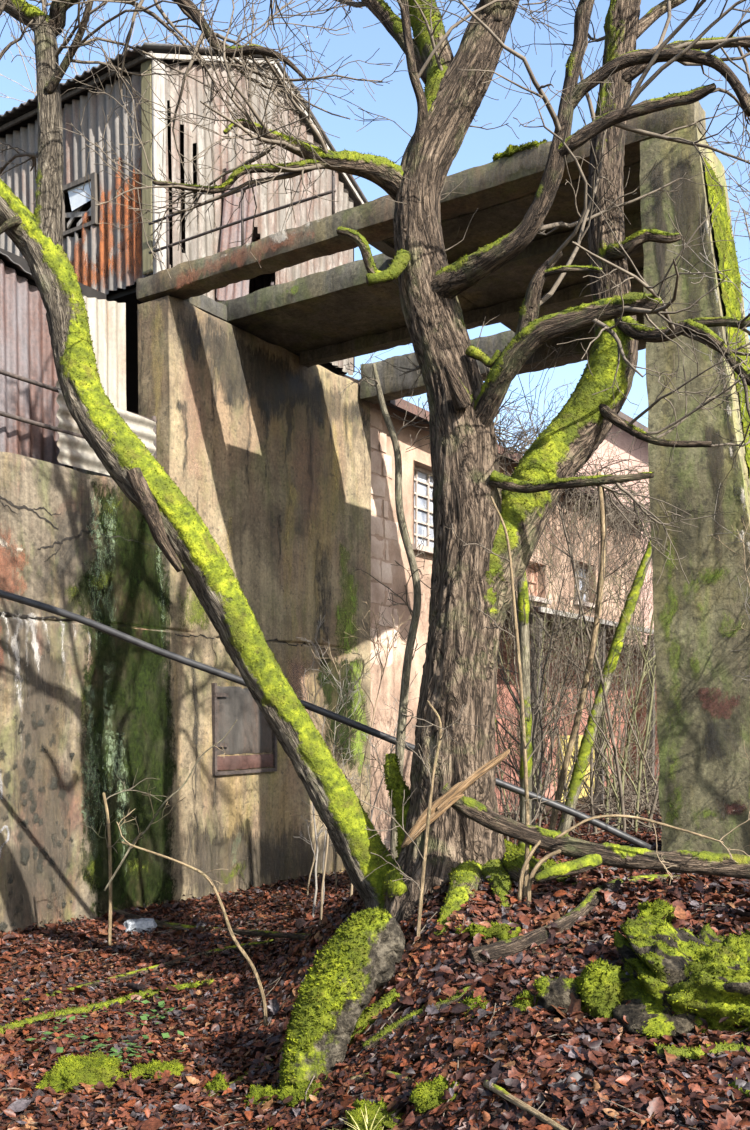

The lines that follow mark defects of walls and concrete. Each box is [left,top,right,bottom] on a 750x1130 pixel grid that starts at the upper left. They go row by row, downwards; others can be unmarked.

corrosion [70,153,142,288]
leakage [651,154,721,338]
crack [0,496,159,562]
leakage [177,317,368,487]
leakage [705,352,750,569]
leakage [1,612,46,702]
leakage [62,476,345,917]
leakage [698,687,742,772]